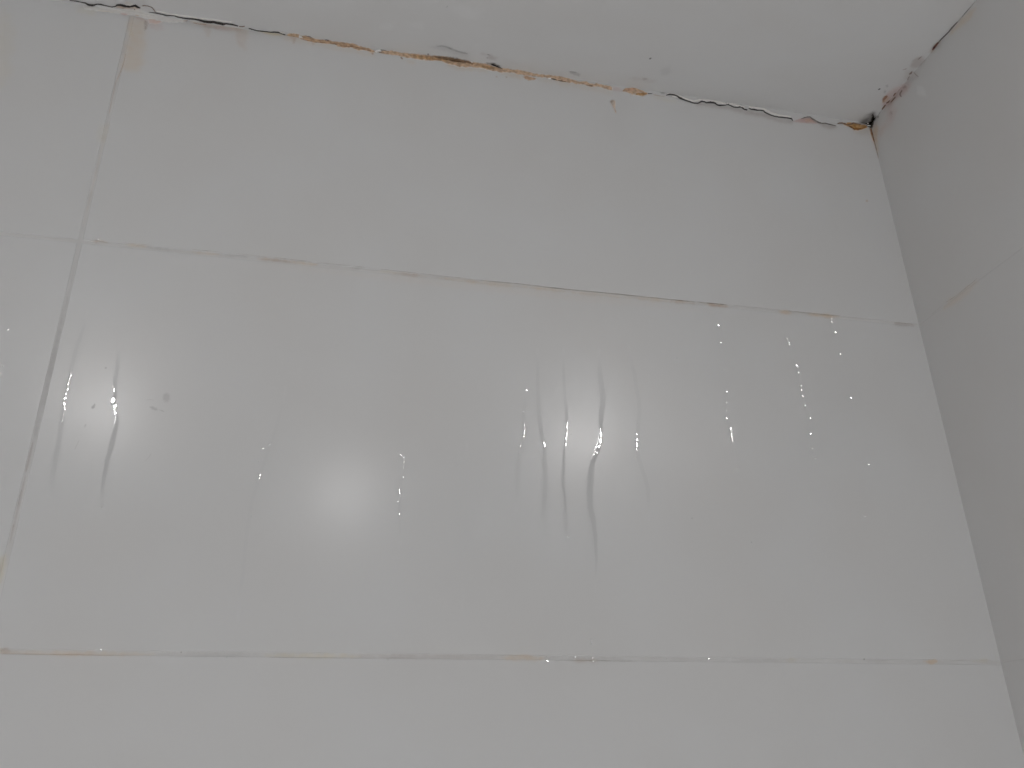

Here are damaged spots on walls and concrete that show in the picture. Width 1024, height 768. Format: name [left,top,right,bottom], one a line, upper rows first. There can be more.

crack [70,0,285,35]
crack [666,93,846,126]
damp [46,310,89,498]
damp [101,344,121,502]
damp [514,348,548,530]
damp [561,348,569,537]
damp [586,348,606,593]